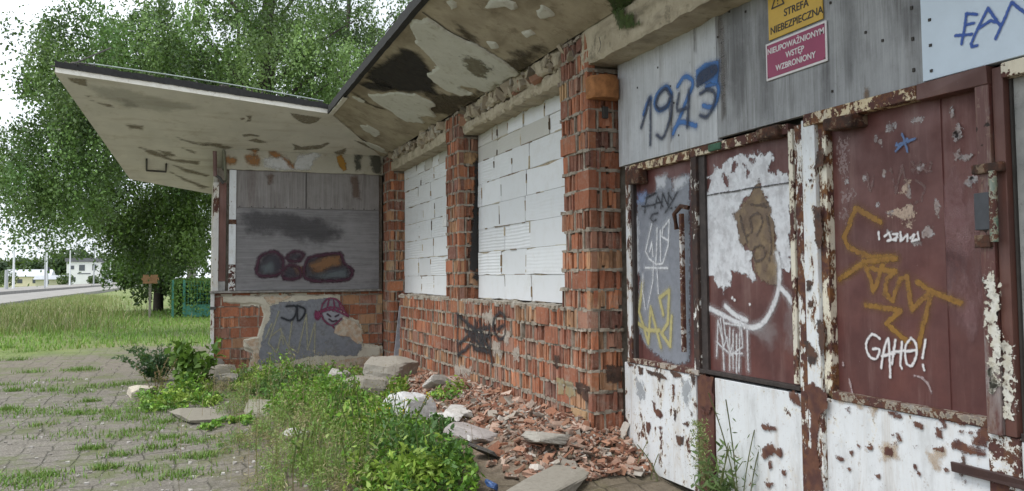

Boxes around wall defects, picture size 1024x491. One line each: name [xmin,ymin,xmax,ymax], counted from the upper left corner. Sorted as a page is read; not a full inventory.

flaking render [485,0,518,10]
flaking render [536,5,555,19]
leakage [356,49,480,115]
flaking render [409,17,575,126]
flaking render [352,92,445,160]
leakage [145,141,231,188]
leakage [354,155,382,174]
flaking render [221,293,383,371]
peeling [982,267,1018,421]
corrosion [674,409,693,447]